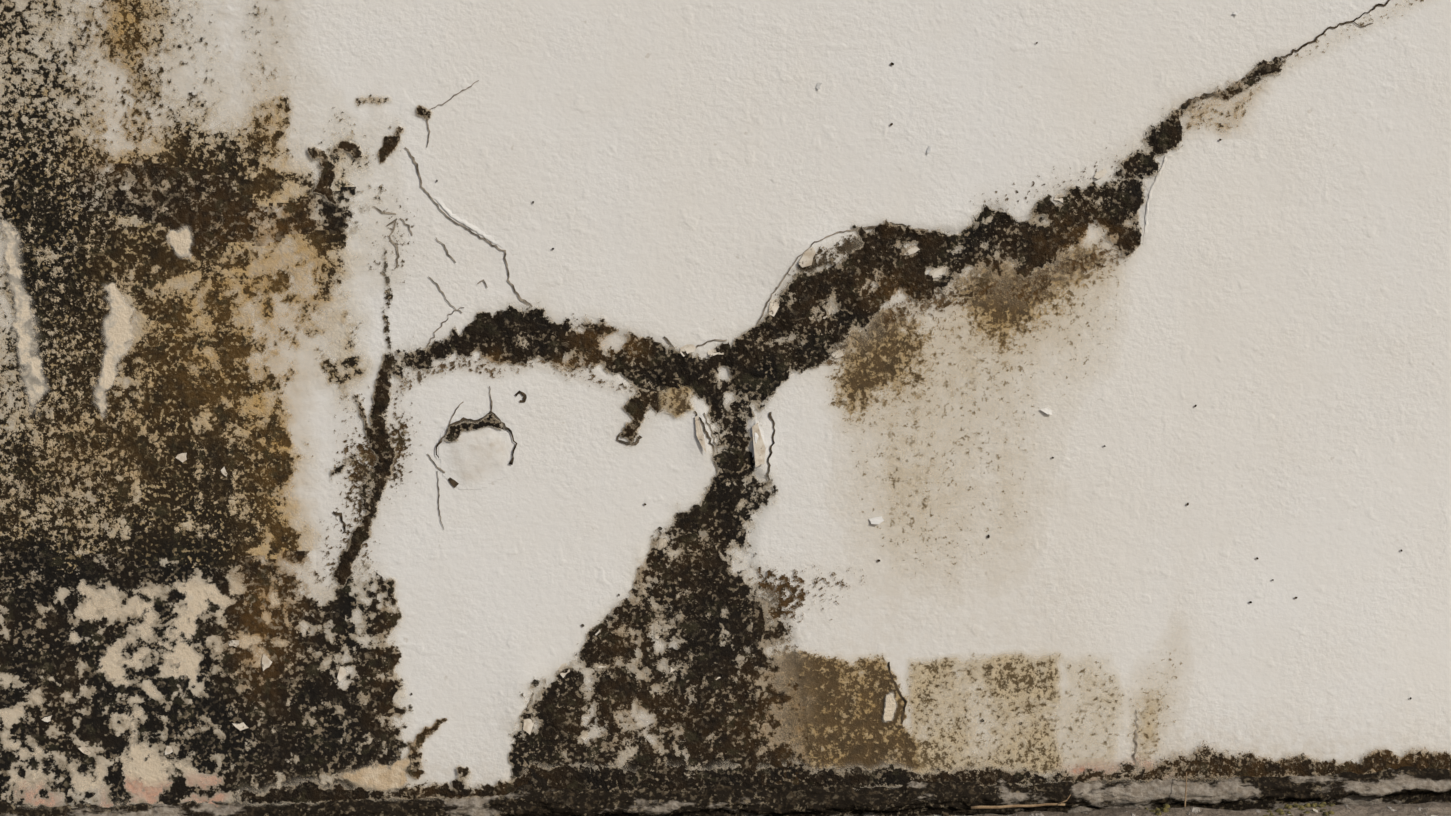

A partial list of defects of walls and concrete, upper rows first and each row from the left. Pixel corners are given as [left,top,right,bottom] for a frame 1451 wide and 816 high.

damp [356,97,389,106]
damp [416,105,431,119]
damp [378,126,404,164]
crack [318,0,1424,606]
damp [825,243,1119,582]
damp [810,565,848,601]